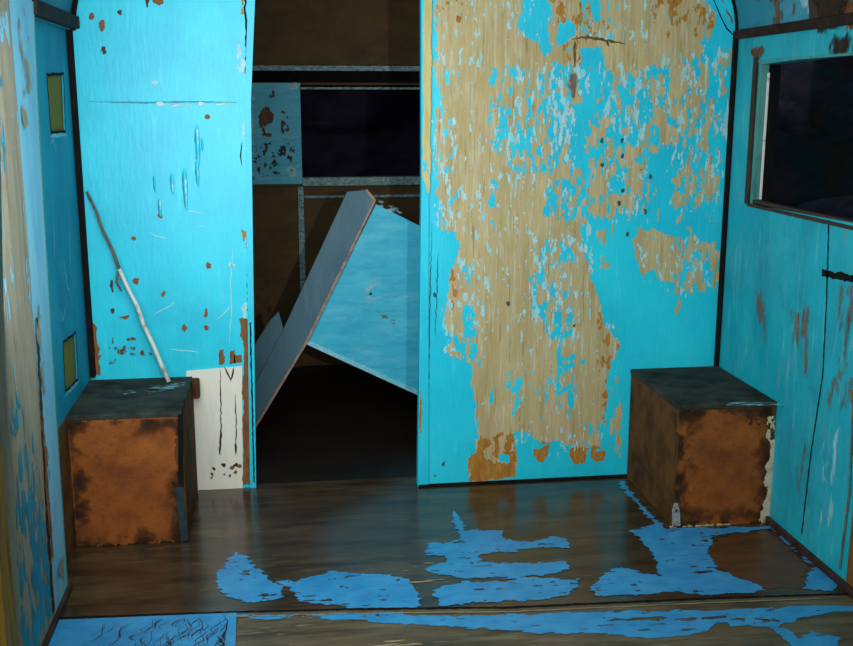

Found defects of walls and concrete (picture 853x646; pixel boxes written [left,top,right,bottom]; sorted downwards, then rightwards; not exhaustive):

peeling [0,9,31,176]
crack [572,36,625,67]
peeling [421,0,732,482]
peeling [0,255,46,396]
peeling [10,365,65,646]